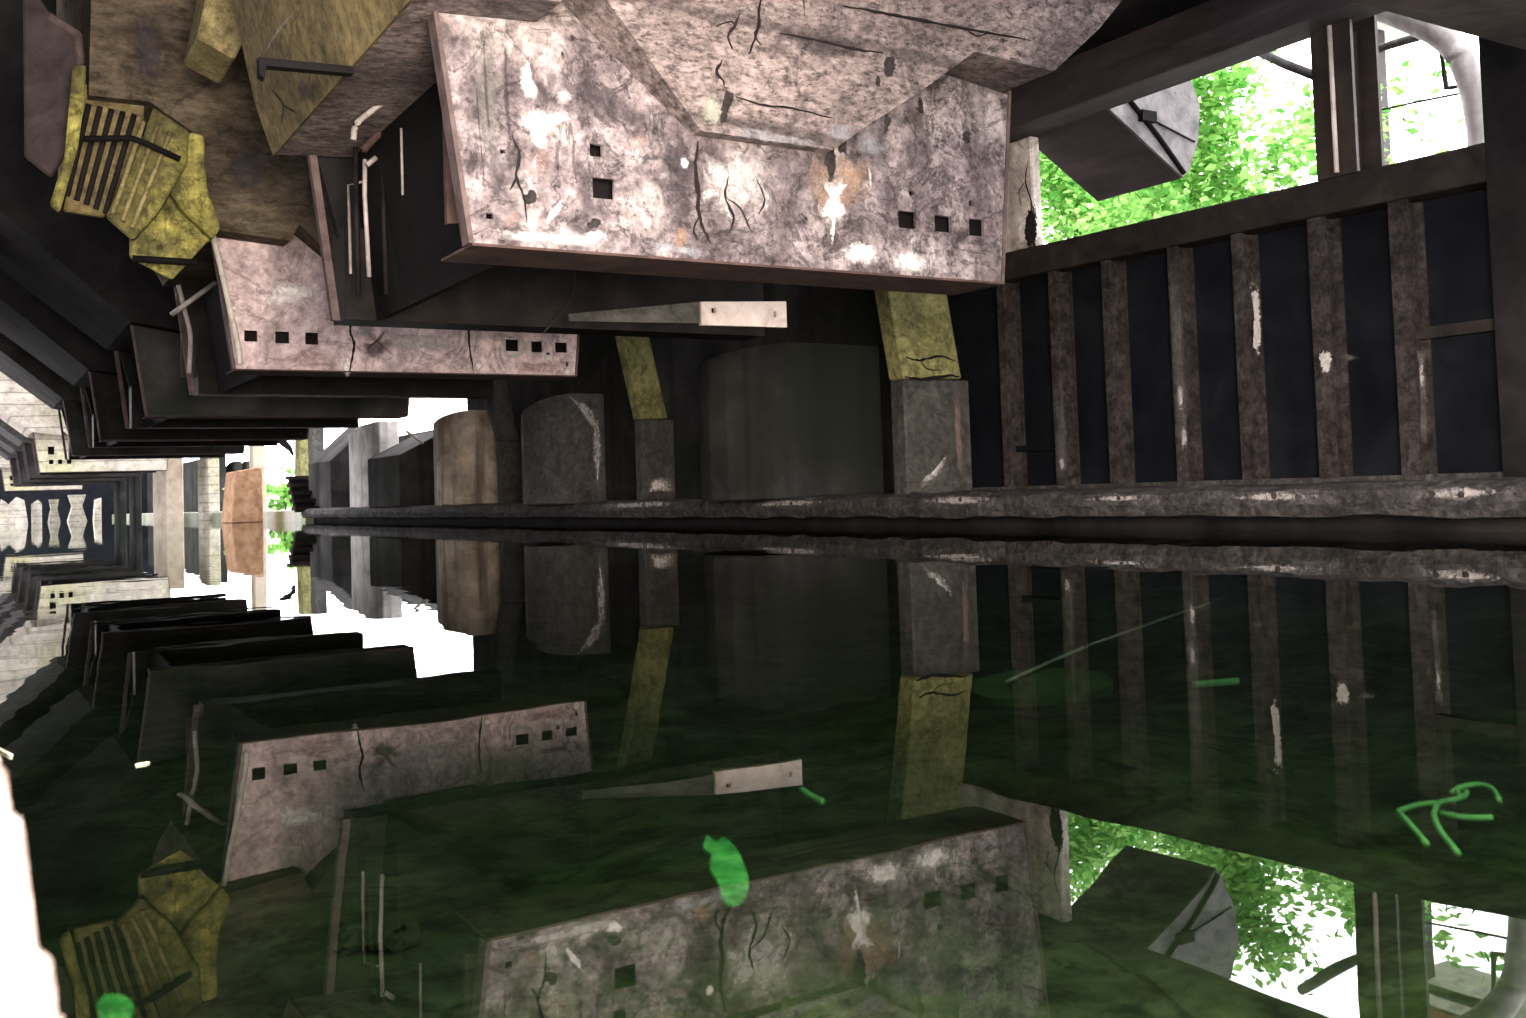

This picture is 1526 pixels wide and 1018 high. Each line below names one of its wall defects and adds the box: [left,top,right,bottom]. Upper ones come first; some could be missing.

crack [715,0,883,118]
crack [843,5,1031,41]
crack [693,141,766,244]
crack [905,355,960,381]